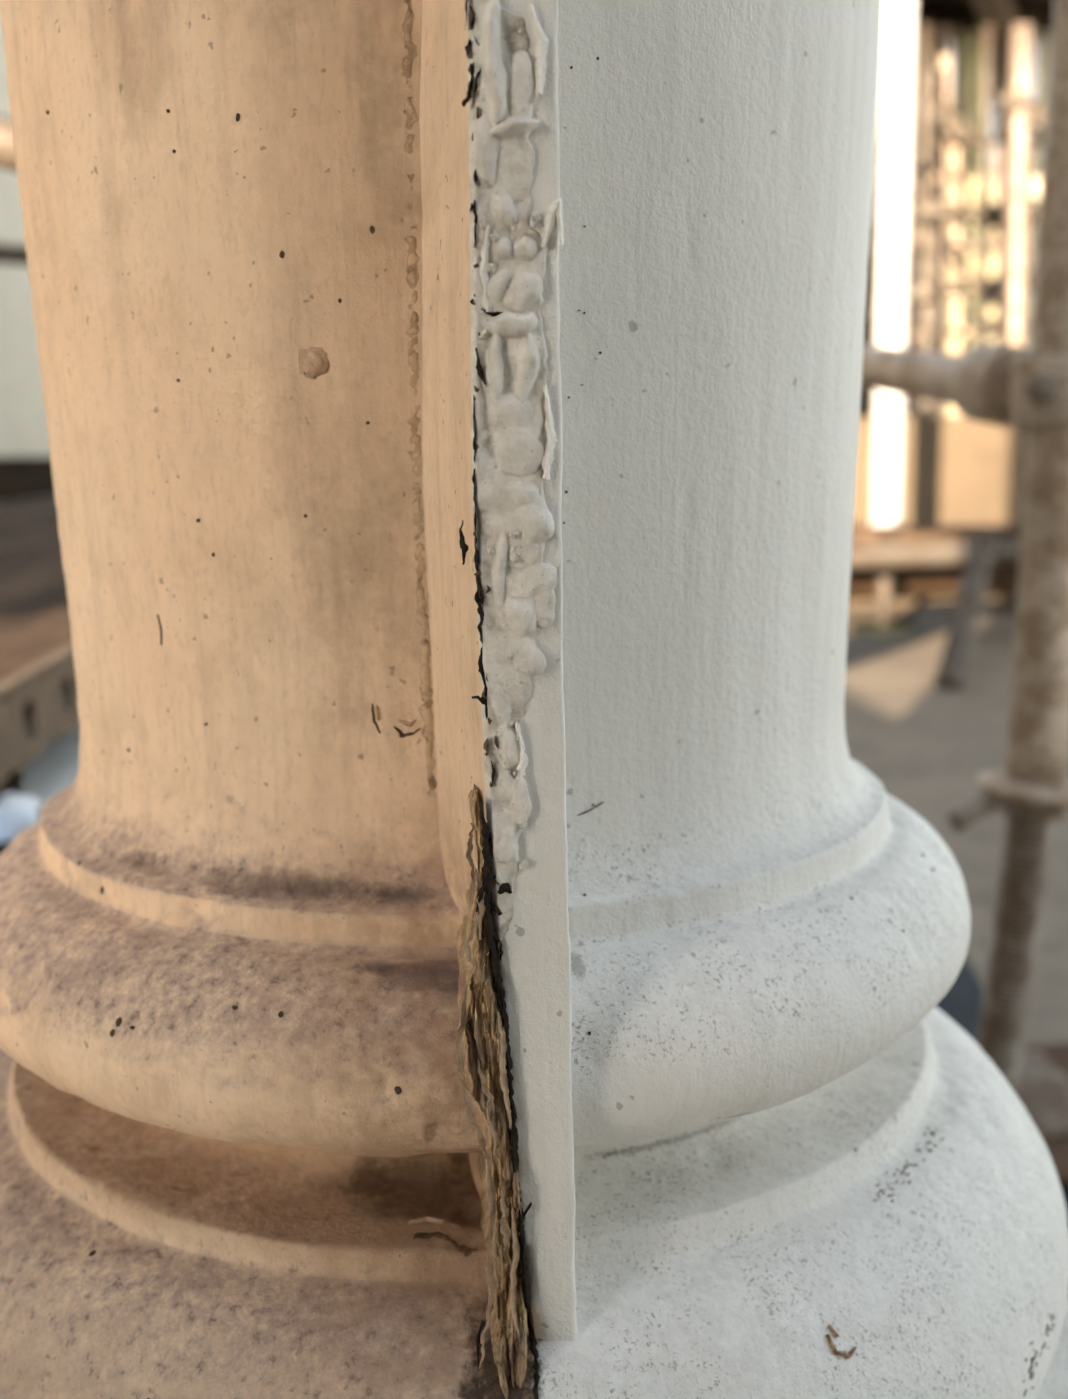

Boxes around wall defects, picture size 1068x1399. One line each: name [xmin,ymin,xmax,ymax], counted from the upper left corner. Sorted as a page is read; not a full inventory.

spalling [409,0,565,1399]
crack [459,0,540,1399]